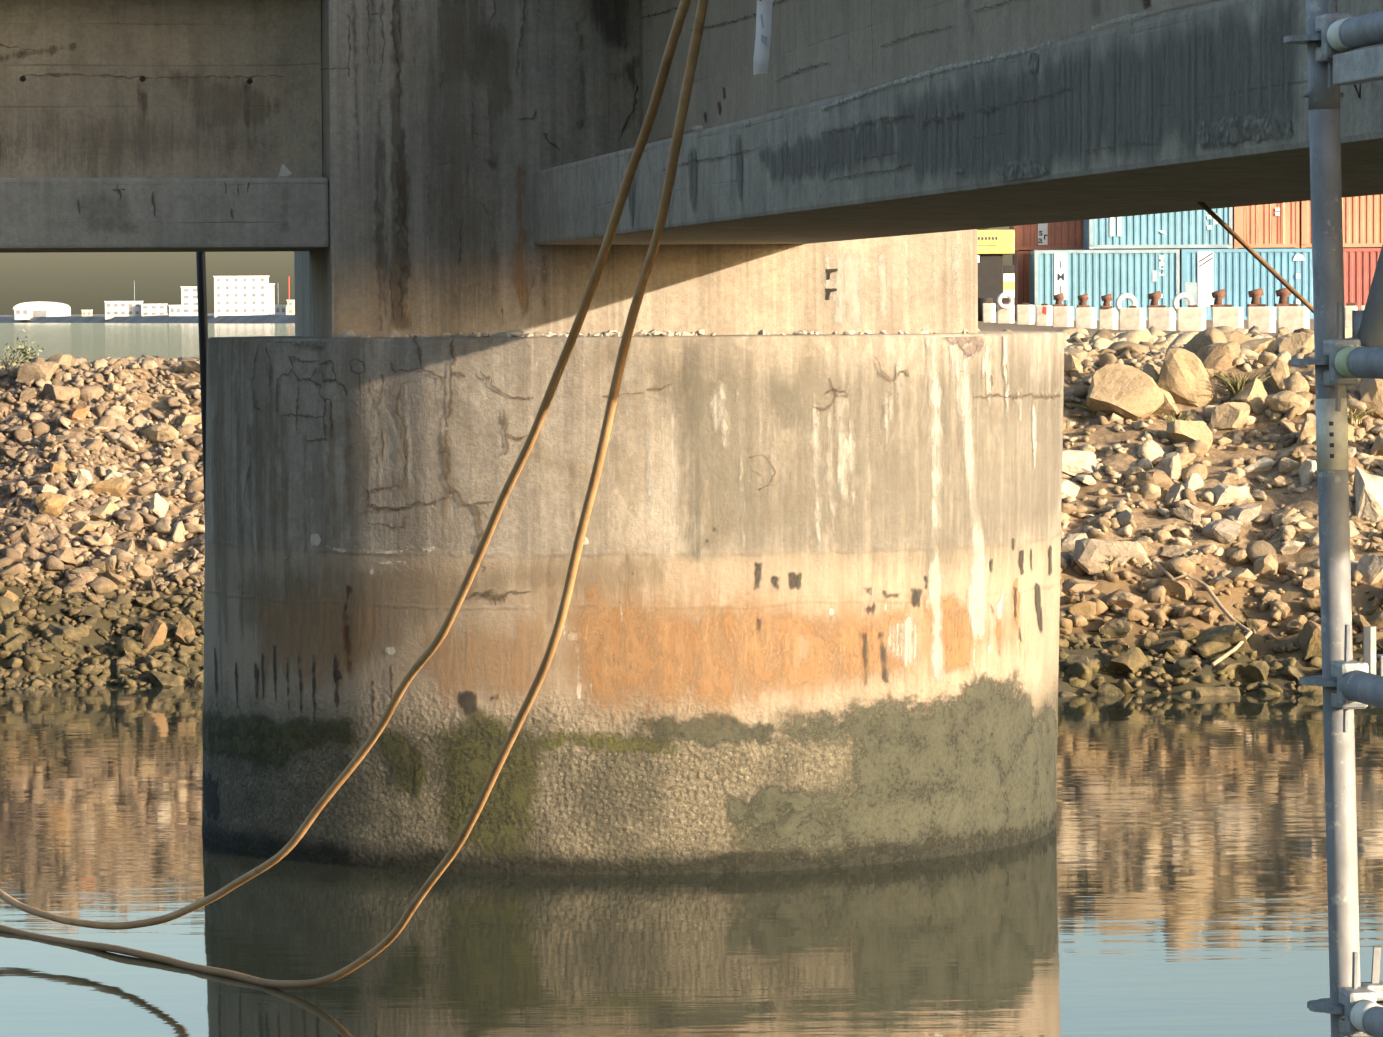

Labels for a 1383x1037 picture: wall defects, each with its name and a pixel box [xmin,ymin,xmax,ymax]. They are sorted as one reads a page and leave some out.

crack [320,0,416,111]
damp [759,7,1292,181]
damp [374,0,407,328]
crack [244,65,533,605]
damp [693,376,761,553]
damp [235,645,316,722]
damp [334,656,342,707]
damp [372,647,395,713]
damp [458,691,498,715]
rust [571,587,976,709]
rust [997,579,1020,652]